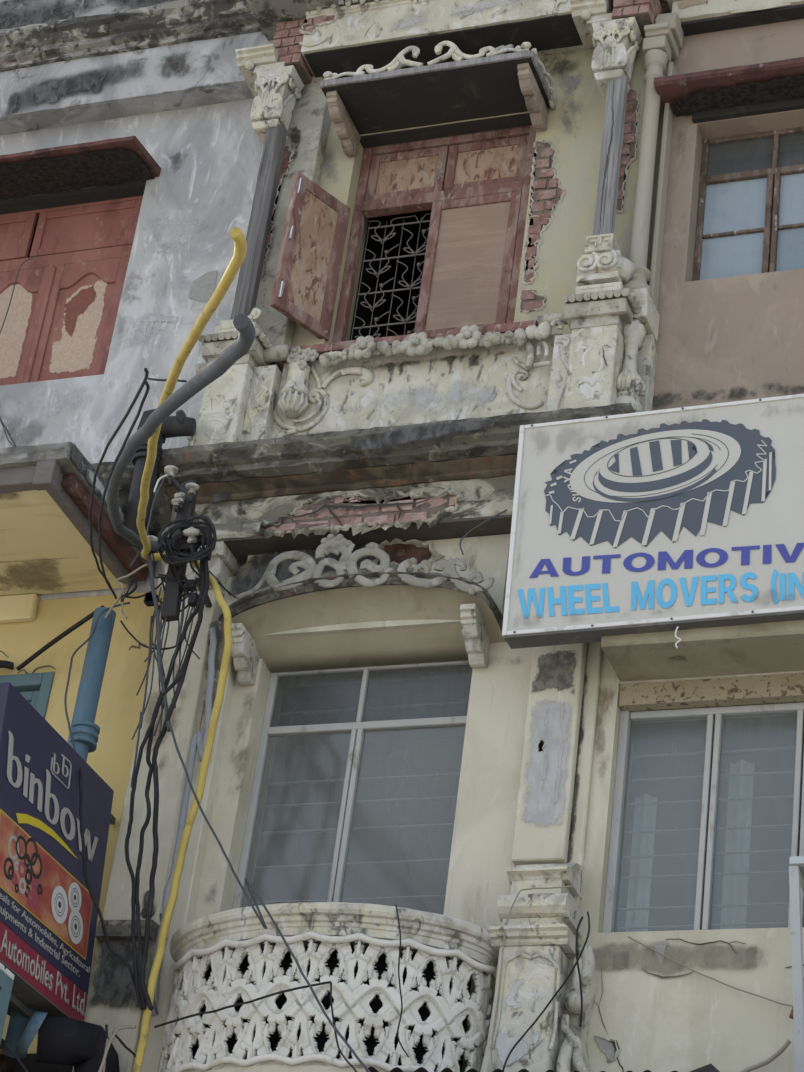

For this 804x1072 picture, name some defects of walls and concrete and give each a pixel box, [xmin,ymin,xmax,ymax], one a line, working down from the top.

damp [0,0,72,30]
spalling [611,0,663,40]
damp [161,54,189,77]
damp [7,62,142,120]
spalling [616,88,640,213]
spalling [518,140,566,314]
damp [652,393,679,407]
spalling [259,487,464,572]
peeling [532,650,575,694]
crack [665,938,746,954]
crack [642,968,693,979]
peeling [496,1031,539,1066]